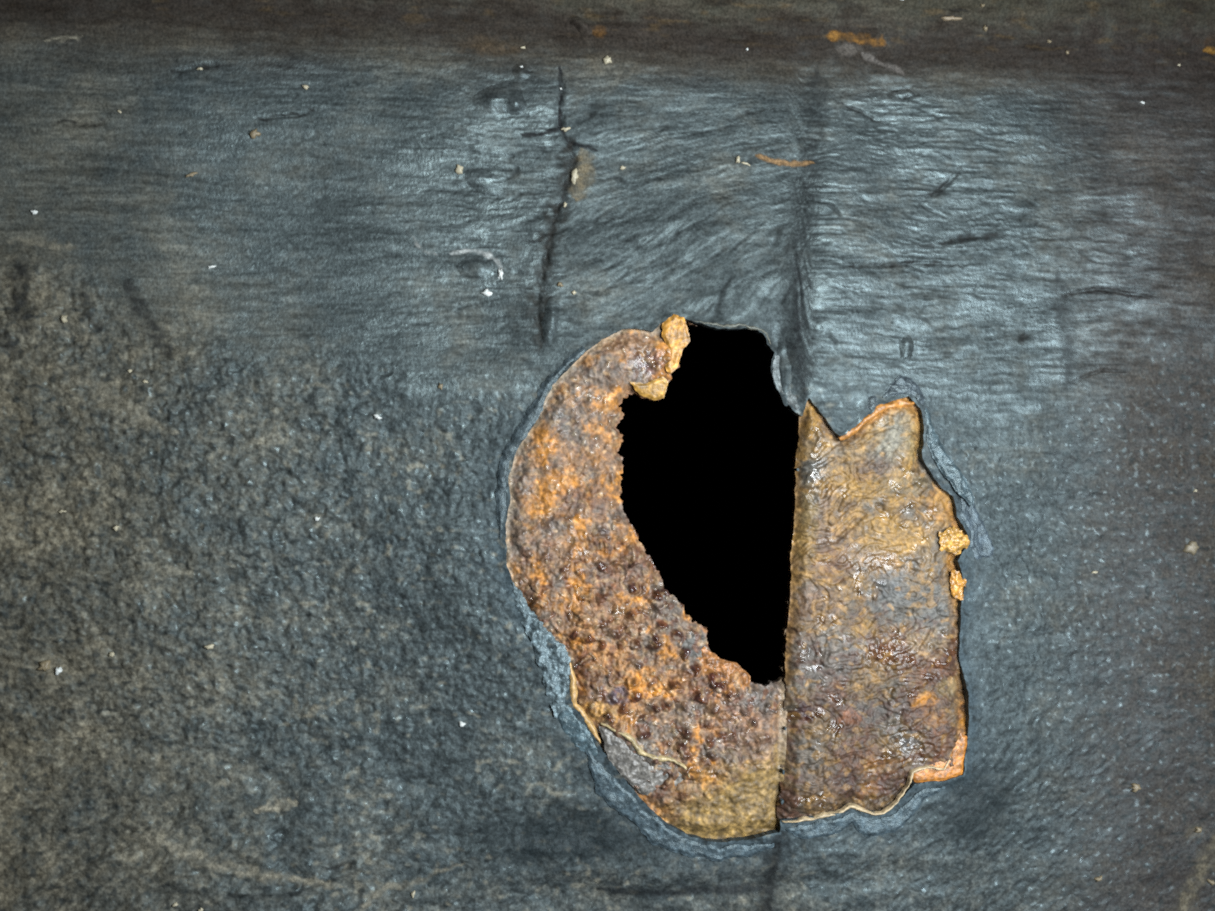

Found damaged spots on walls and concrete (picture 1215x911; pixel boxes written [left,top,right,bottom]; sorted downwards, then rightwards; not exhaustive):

crack [521,67,597,279]
peeling [695,321,800,411]
rust [506,314,970,839]